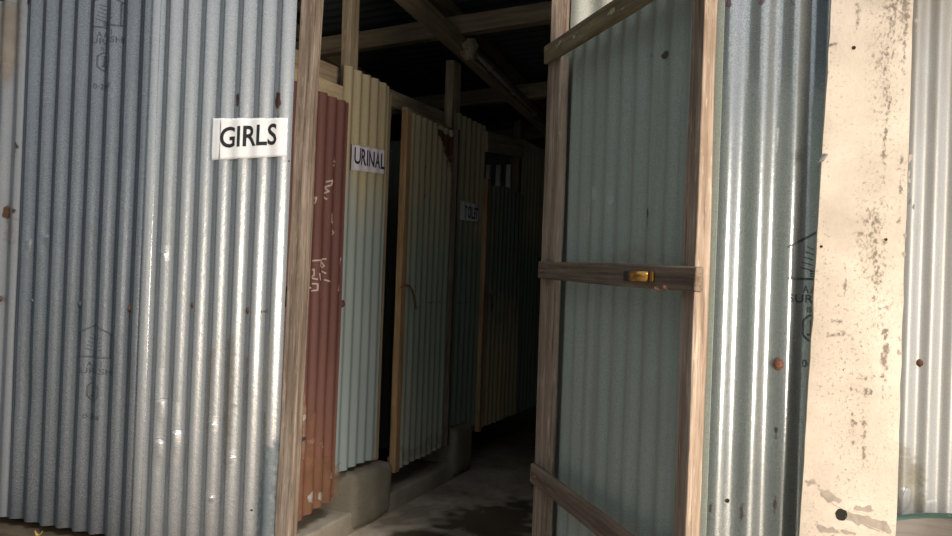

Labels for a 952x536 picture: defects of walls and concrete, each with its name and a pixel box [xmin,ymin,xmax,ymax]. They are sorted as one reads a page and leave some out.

corrosion [298,413,338,519]